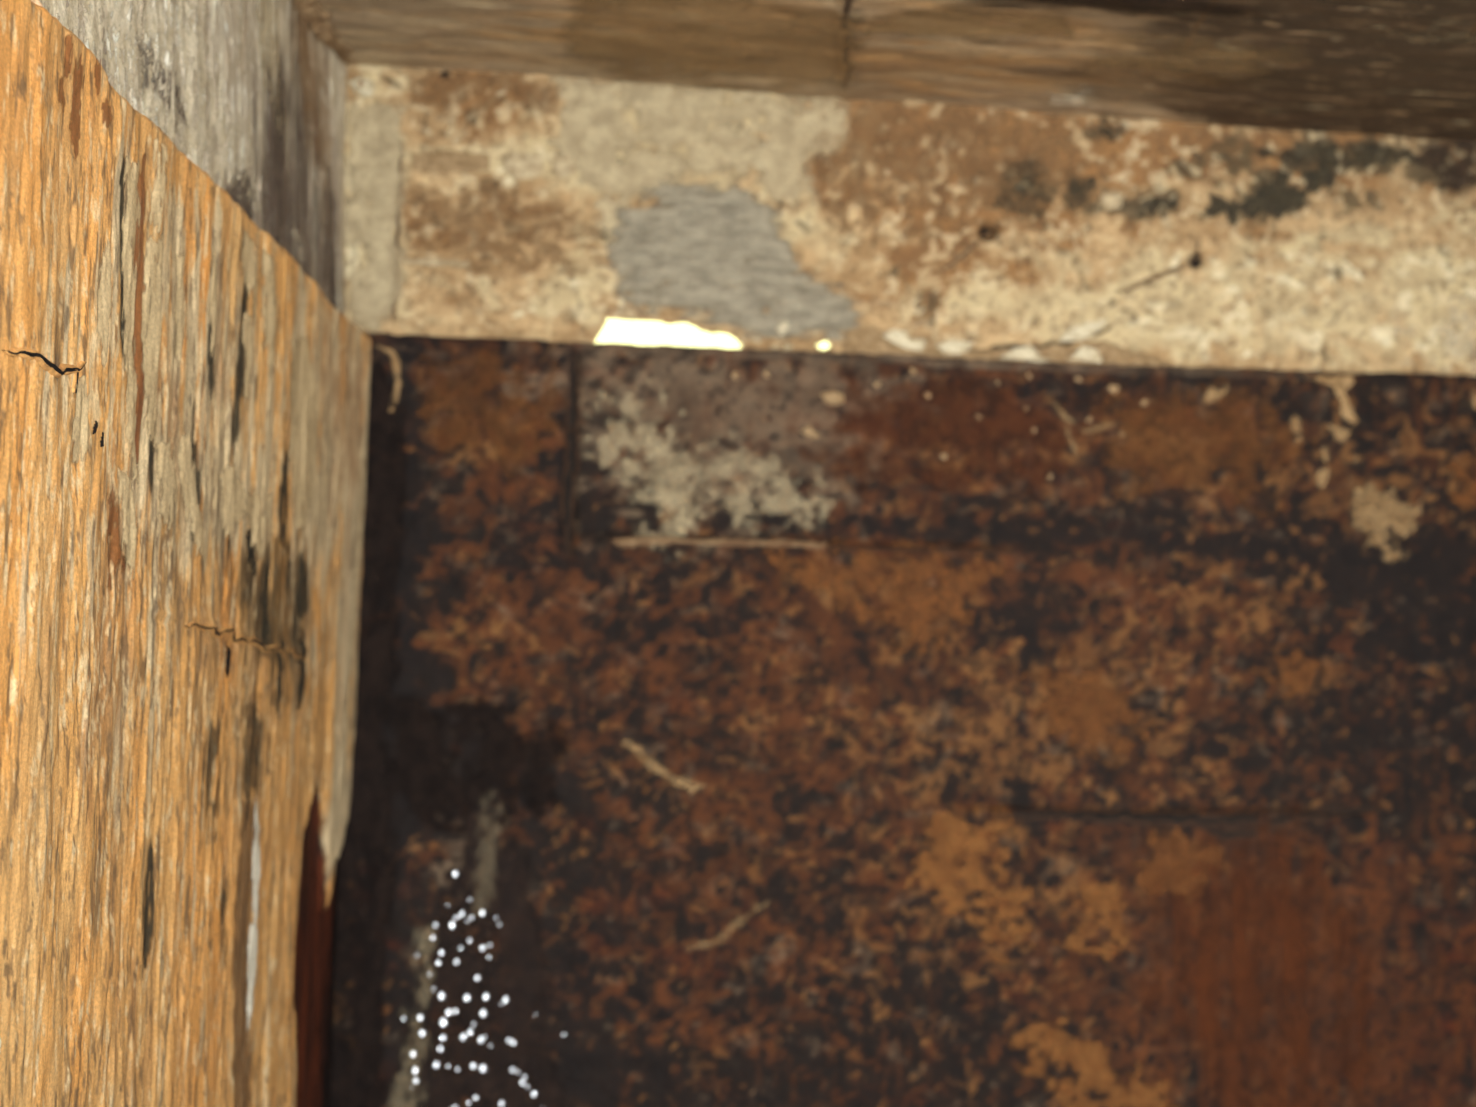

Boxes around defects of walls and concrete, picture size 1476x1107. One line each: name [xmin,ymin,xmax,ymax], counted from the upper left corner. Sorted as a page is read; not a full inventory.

crack [841,0,853,90]
corrosion [59,35,112,159]
mould [993,159,1096,217]
mould [1134,193,1178,218]
mould [1199,140,1419,226]
crack [3,347,87,393]
corrosion [132,154,146,464]
spalling [776,321,789,336]
spalling [841,319,1168,366]
corrosion [107,484,126,589]
crack [185,622,306,660]
water stain [221,445,308,1107]